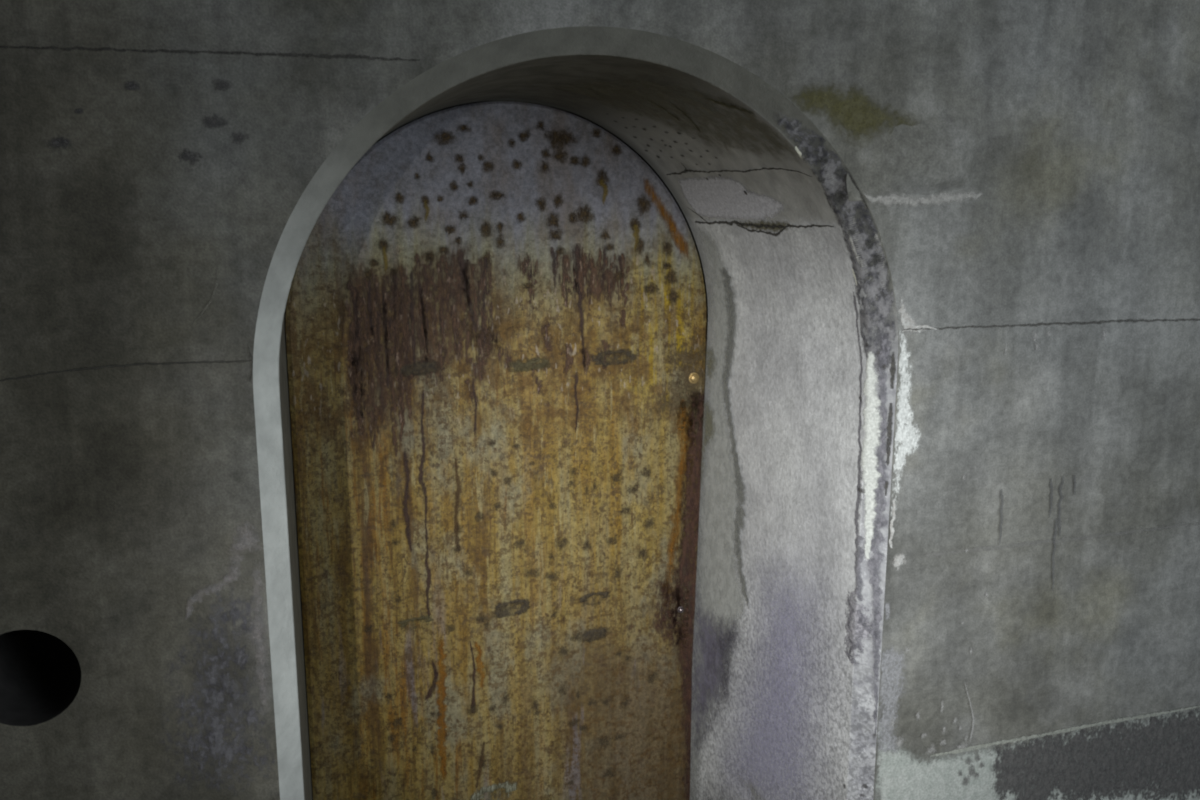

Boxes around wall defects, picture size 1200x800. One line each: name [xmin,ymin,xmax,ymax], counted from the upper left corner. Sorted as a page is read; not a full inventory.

rust [435,125,470,145]
crack [667,163,811,177]
crack [687,207,834,237]
rust [509,122,688,432]
rust [346,155,513,617]
rust [655,339,714,800]
rust [426,626,455,778]
rust [469,641,508,713]
leakage [876,710,1200,800]